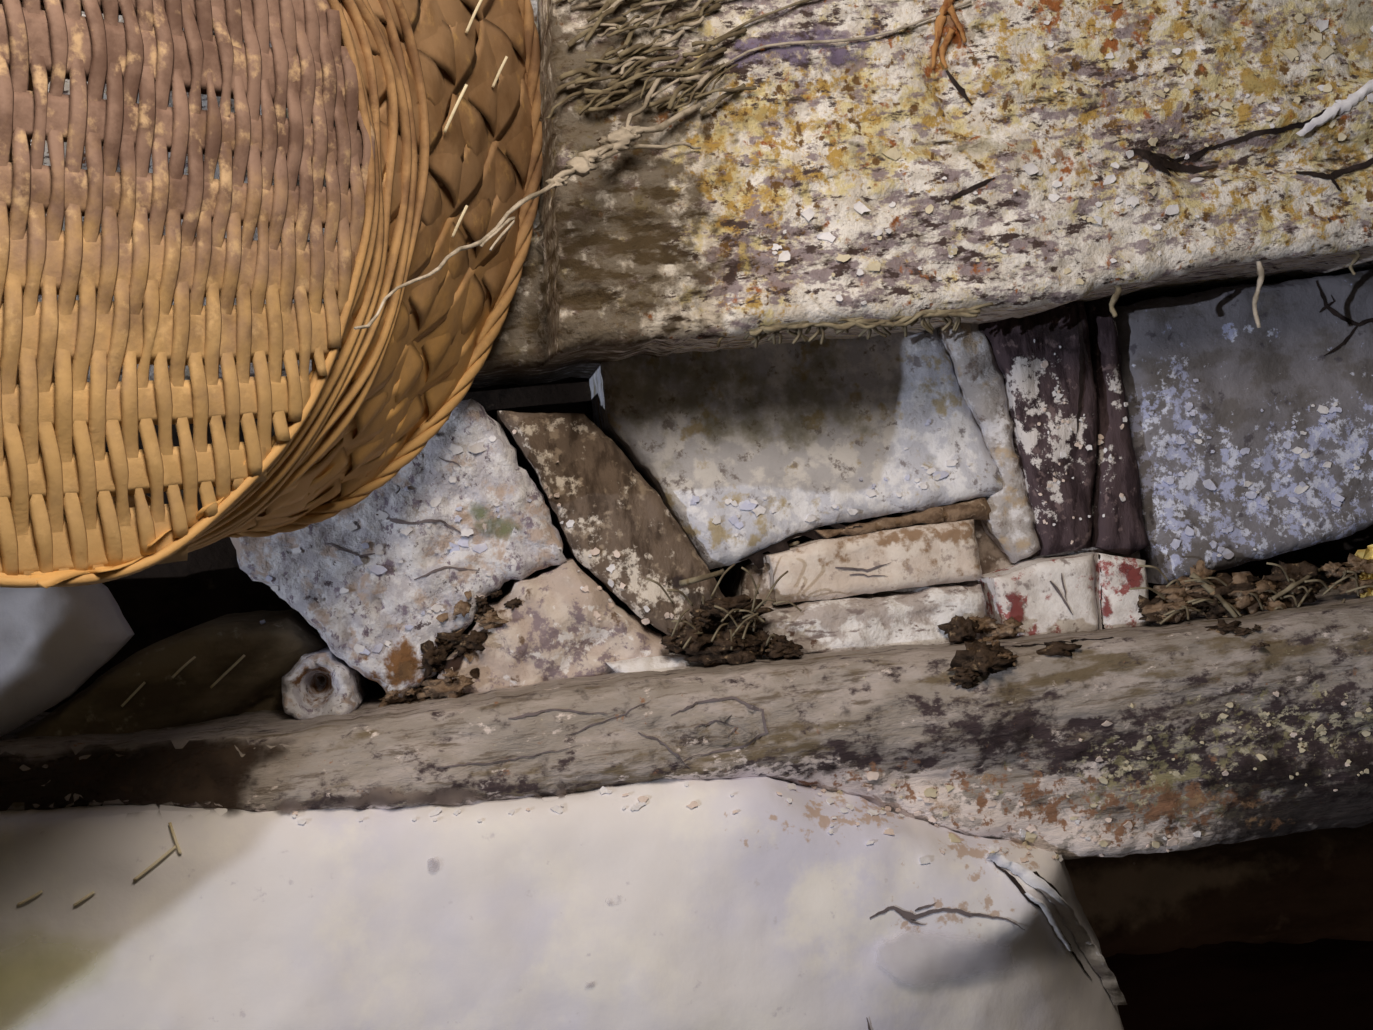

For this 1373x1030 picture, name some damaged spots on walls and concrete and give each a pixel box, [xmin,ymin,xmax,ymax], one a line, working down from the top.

crack [1128,79,1373,176]
crack [1296,158,1373,192]